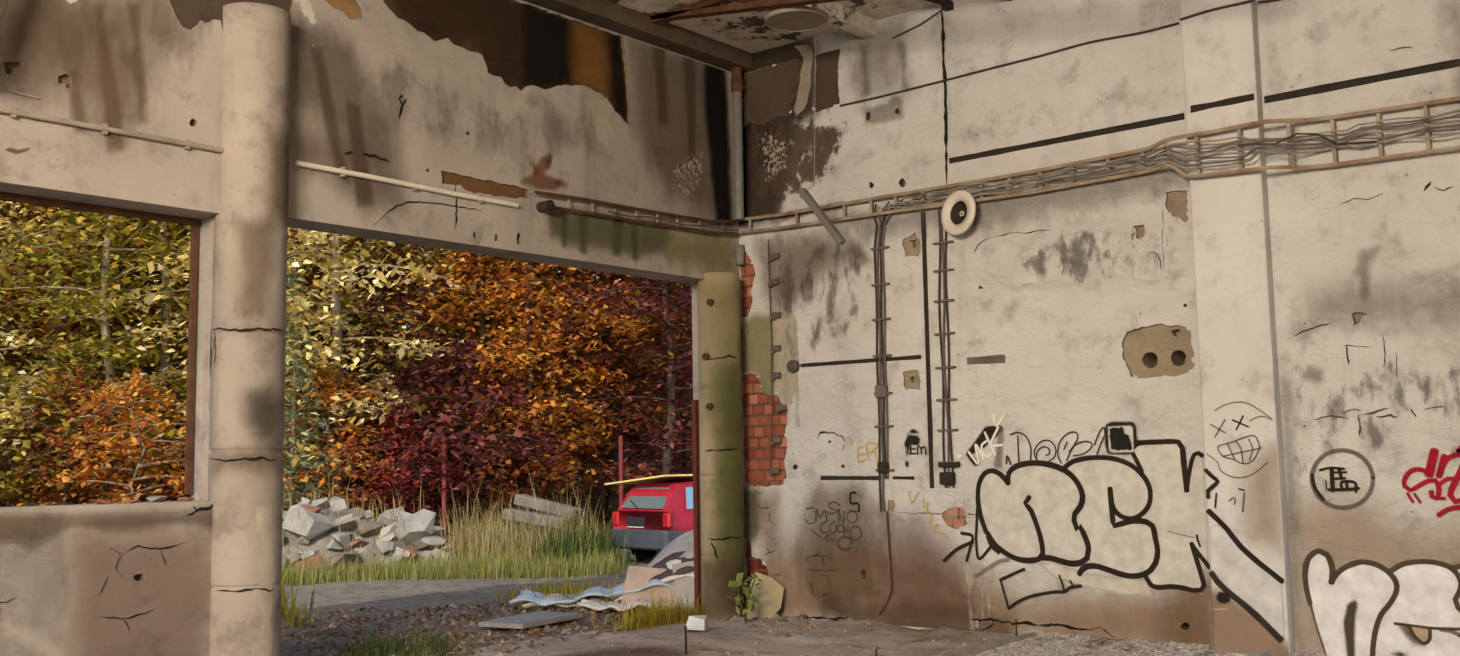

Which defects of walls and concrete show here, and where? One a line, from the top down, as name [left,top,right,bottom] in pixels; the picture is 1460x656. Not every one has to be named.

flaking render [383,0,630,125]
peeling [743,44,842,205]
crack [209,455,279,463]
flaking render [742,314,799,487]
flaking render [1120,324,1196,380]
crack [99,504,213,631]
crack [218,586,275,594]